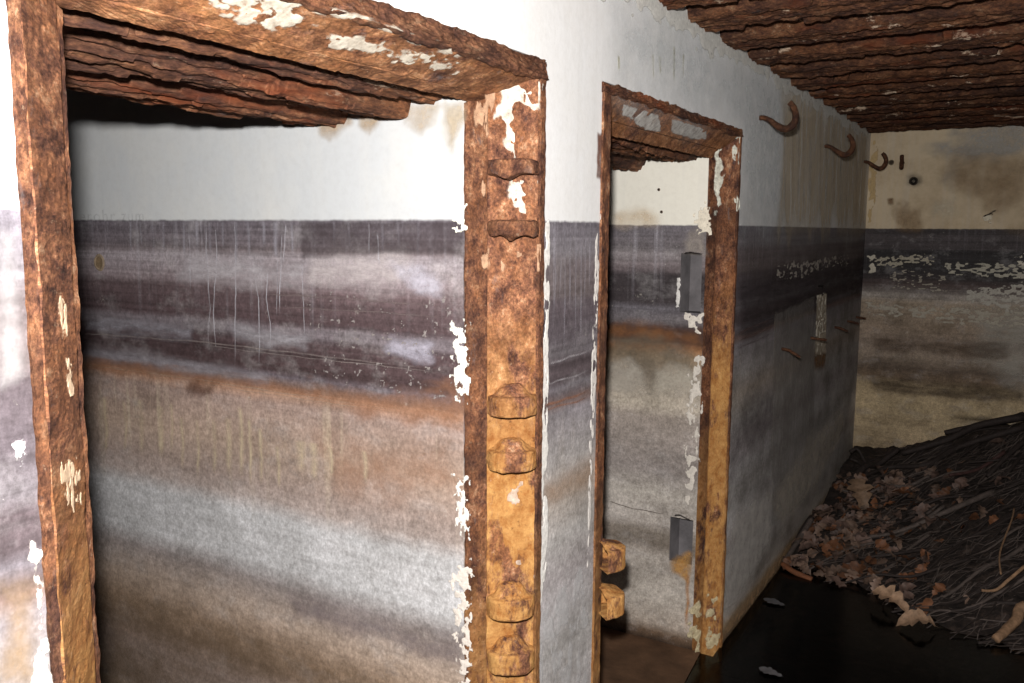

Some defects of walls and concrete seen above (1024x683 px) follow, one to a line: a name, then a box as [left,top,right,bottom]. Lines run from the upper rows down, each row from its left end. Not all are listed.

damp [311,259,437,292]
peeling [777,255,849,279]
peeling [865,253,1024,328]
peeling [12,441,25,457]
peeling [683,355,705,505]
peeling [451,473,471,541]
peeling [449,558,475,683]